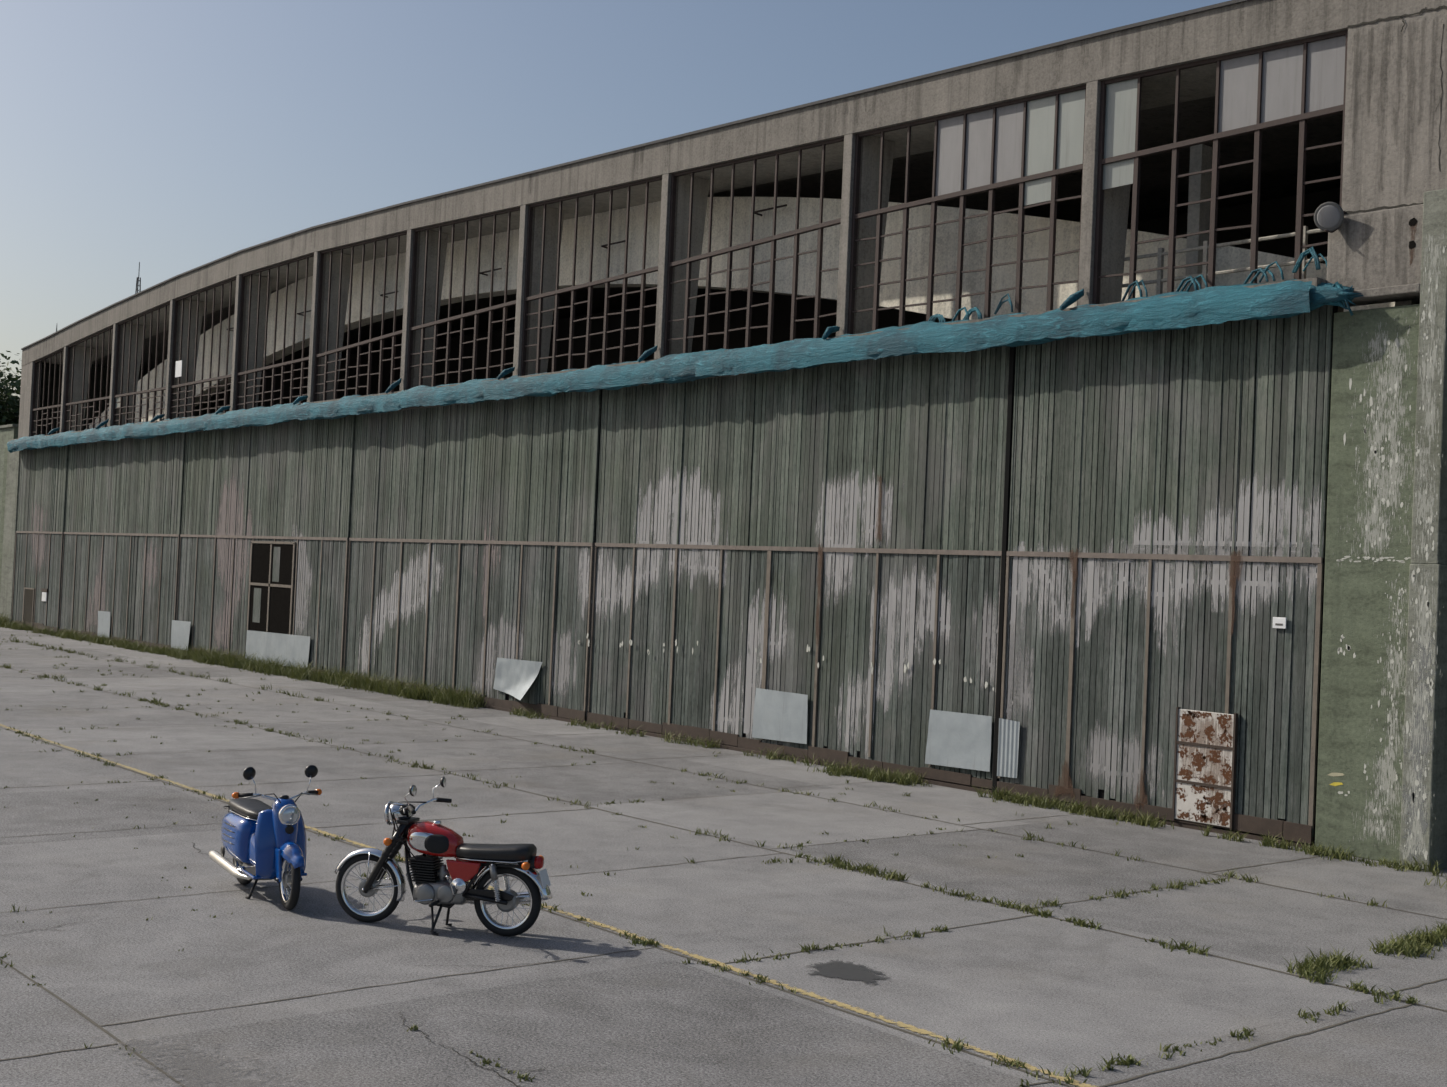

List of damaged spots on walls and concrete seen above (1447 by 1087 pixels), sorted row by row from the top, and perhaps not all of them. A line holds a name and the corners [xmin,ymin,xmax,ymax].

peeling [355,543,443,675]
peeling [551,467,728,697]
peeling [815,471,893,607]
peeling [835,564,951,759]
peeling [964,233,1447,860]
corrosion [1175,710,1233,826]
crack [398,1012,542,1087]